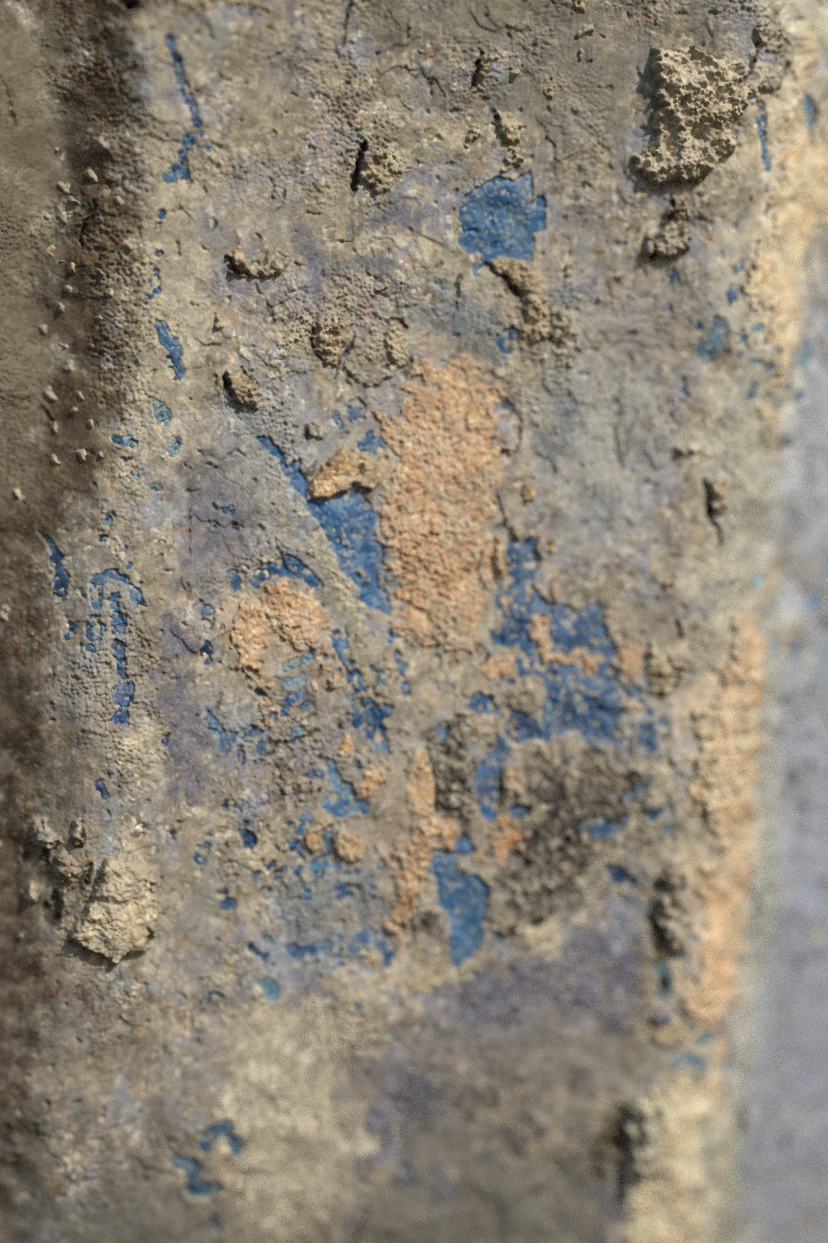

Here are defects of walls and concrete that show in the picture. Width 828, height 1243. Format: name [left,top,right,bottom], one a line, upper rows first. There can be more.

flaking render [741,21,828,455]
flaking render [228,347,557,732]
crack [701,480,722,544]
peeling [200,641,212,665]
flaking render [528,582,647,693]
flaking render [336,734,389,800]
flaking render [621,610,769,1243]